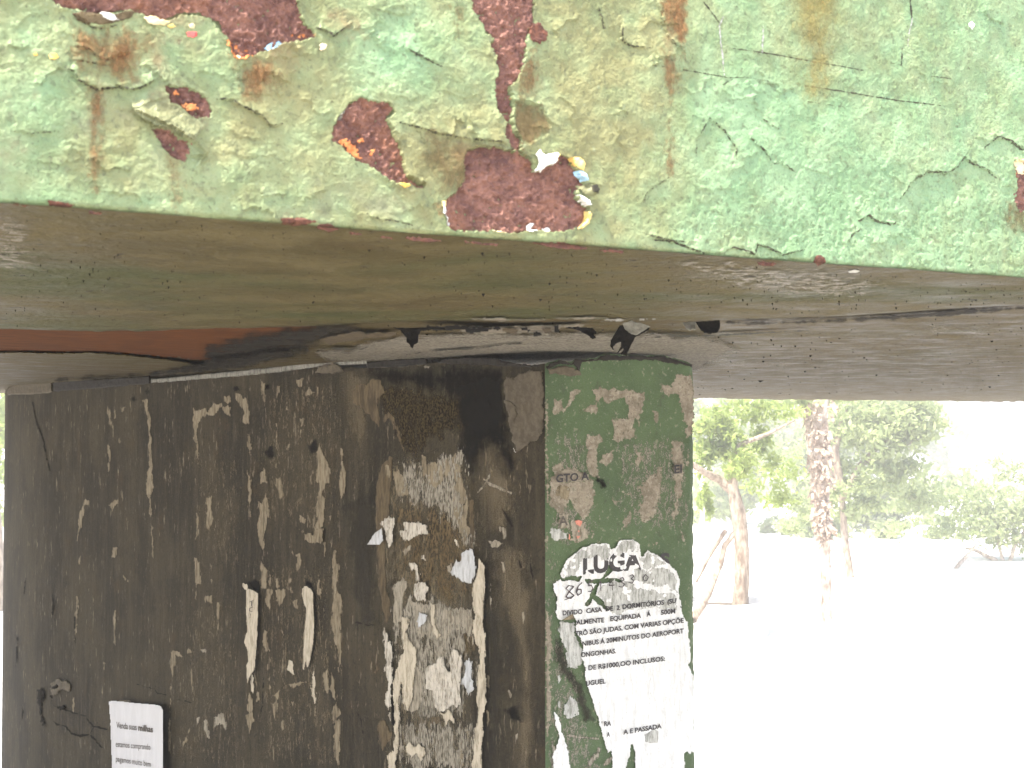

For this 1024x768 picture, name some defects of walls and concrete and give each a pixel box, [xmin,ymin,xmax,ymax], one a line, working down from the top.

rust [664,0,688,42]
peeling [132,97,205,141]
peeling [516,103,548,143]
crack [696,118,795,172]
crack [849,136,1024,242]
crack [32,402,50,471]
damp [381,384,506,462]
peeling [317,317,738,555]
peeling [544,602,552,751]